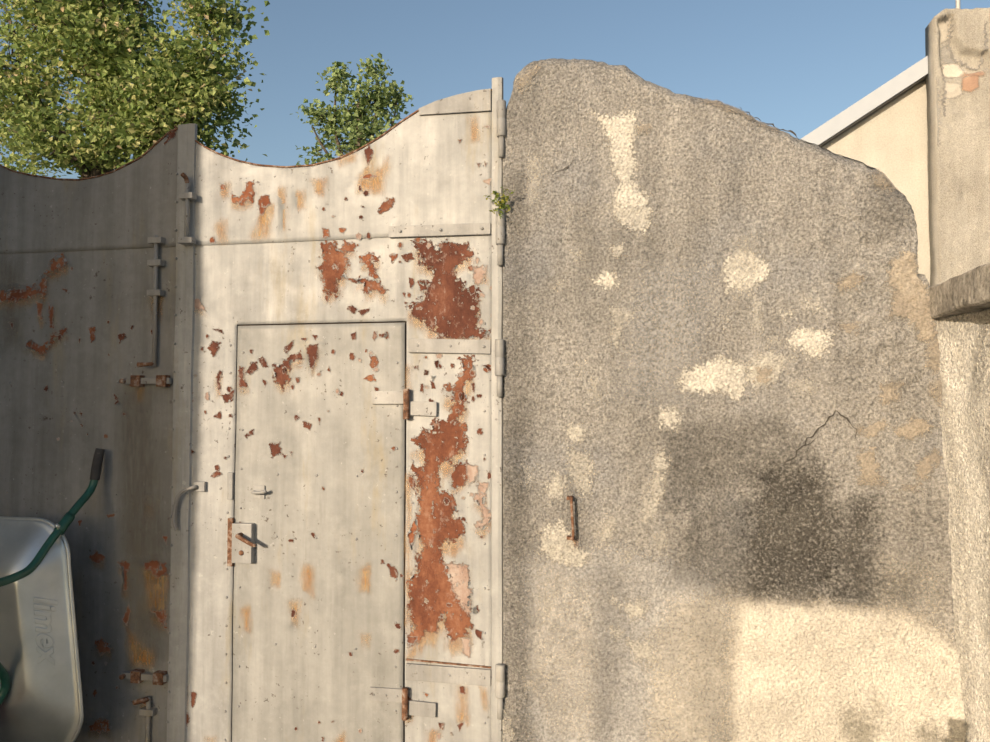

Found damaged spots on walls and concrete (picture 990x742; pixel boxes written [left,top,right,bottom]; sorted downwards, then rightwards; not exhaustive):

flaking render [938,16,952,44]
flaking render [941,63,984,98]
rust [0,252,68,355]
rust [207,328,224,357]
rust [213,334,319,419]
rust [363,354,379,382]
rust [316,227,491,340]
crack [783,410,858,472]
rust [380,354,491,649]
water stain [747,467,872,602]